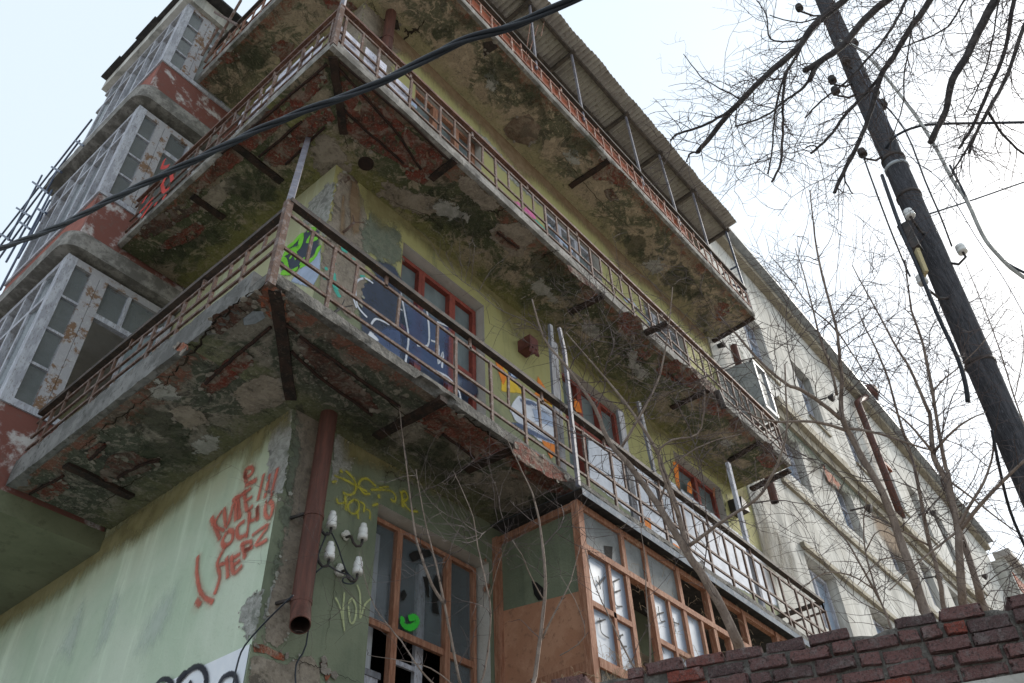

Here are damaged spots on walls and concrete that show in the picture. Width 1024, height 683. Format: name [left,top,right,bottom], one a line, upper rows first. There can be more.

spalling [138,1,449,319]
water stain [380,18,707,342]
crack [79,281,267,450]
peeling [168,406,210,430]
peeling [198,287,401,683]
spalling [510,441,567,495]